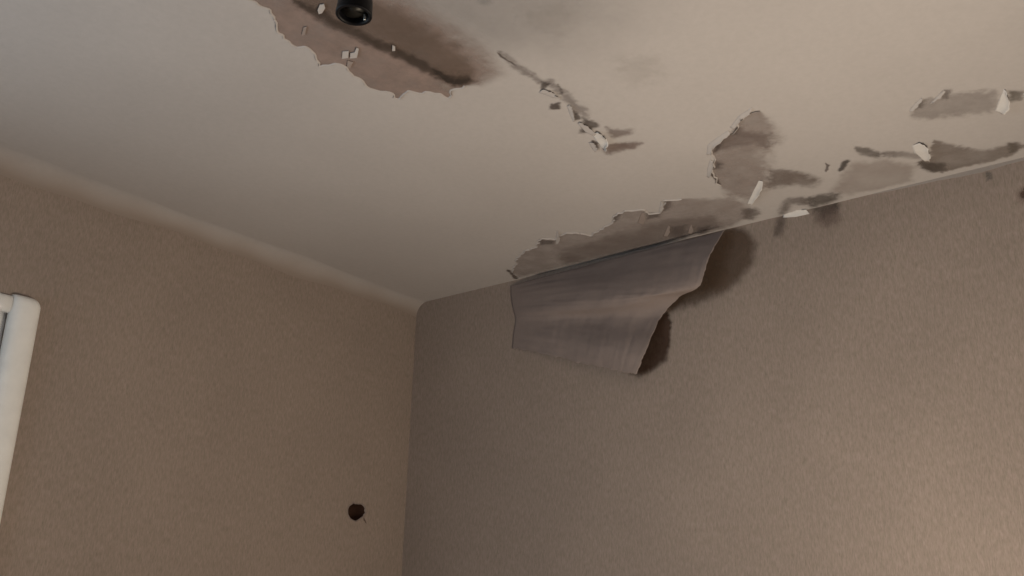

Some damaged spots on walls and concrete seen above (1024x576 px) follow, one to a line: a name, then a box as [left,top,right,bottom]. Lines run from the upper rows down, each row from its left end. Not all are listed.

peeling [248,0,492,100]
peeling [539,82,634,152]
peeling [707,108,769,215]
peeling [912,141,1021,171]
peeling [995,90,1024,115]
peeling [507,198,682,279]